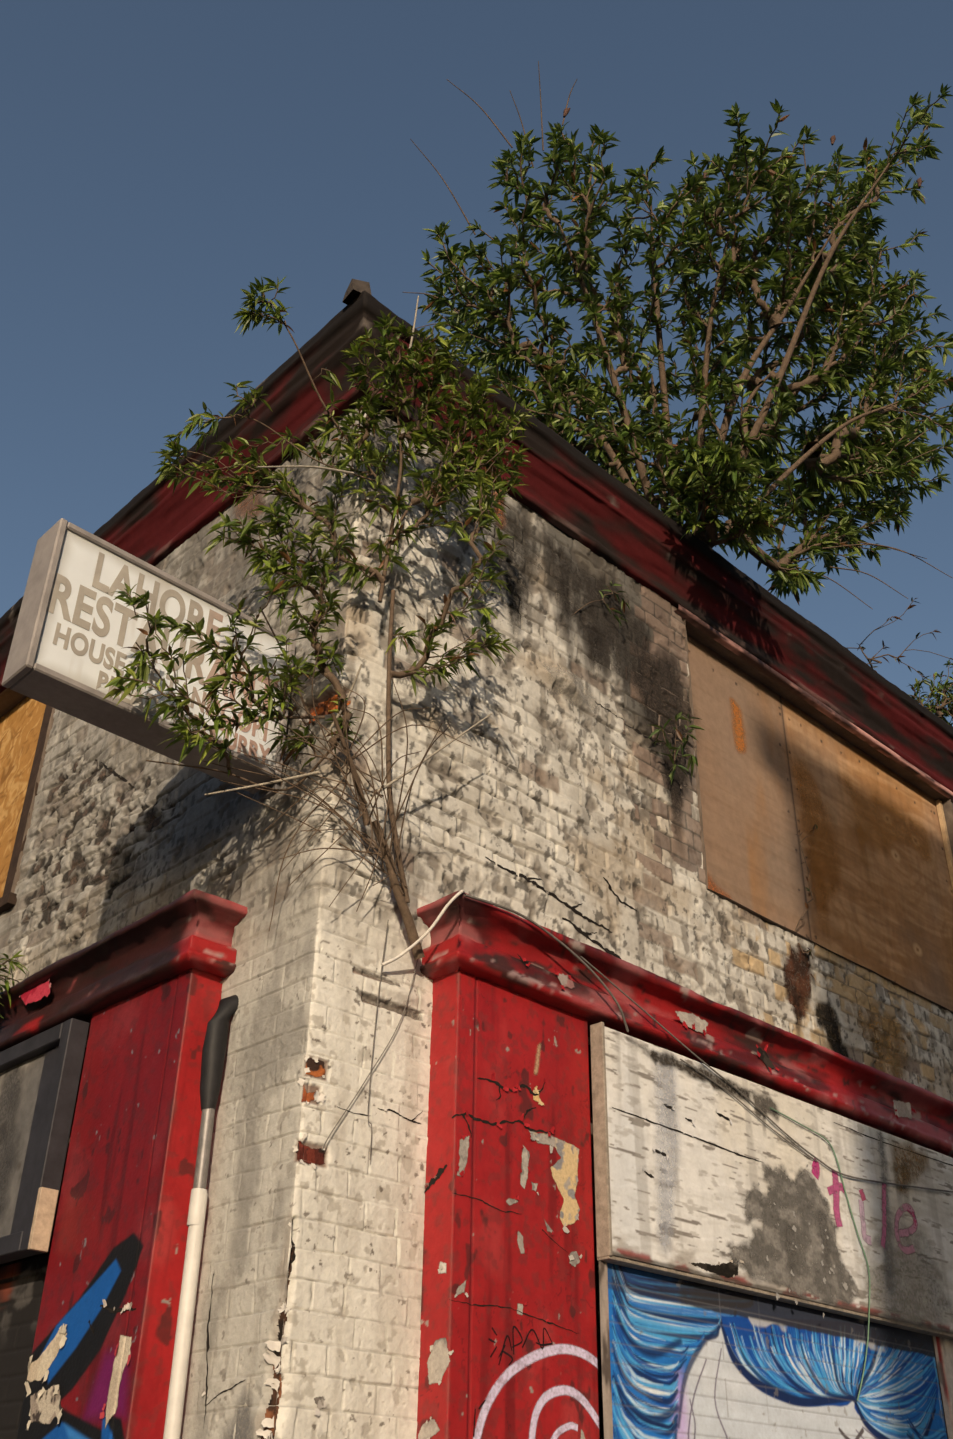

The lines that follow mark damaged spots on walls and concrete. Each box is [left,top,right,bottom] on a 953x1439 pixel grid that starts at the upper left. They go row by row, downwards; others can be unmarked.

flaking render [297,1054,326,1104]
flaking render [292,1134,325,1169]
peeling [516,1230,527,1254]
peeling [506,1130,580,1235]
peeling [568,1251,582,1267]
water stain [731,1132,949,1326]
crack [202,1219,296,1439]
peeling [24,1323,67,1430]
peeling [99,1334,132,1428]